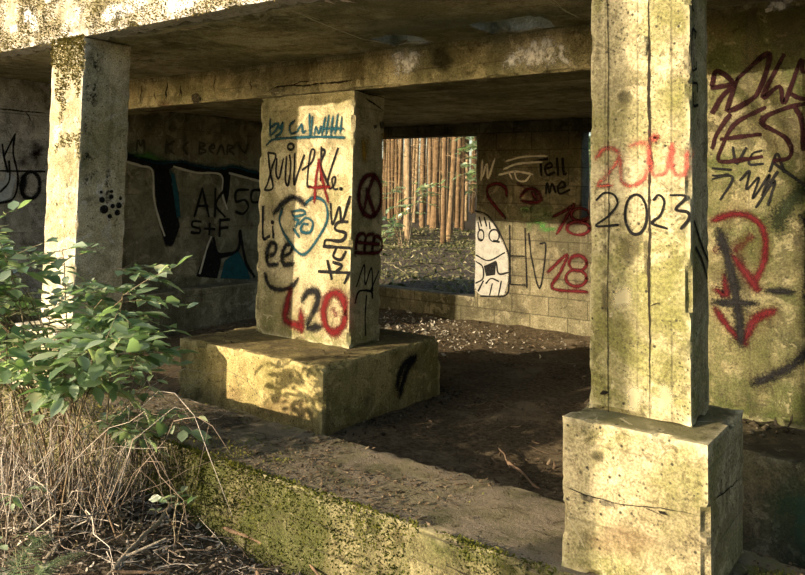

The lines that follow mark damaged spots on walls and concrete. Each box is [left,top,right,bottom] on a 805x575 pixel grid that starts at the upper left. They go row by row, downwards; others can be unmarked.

crack [250,79,387,111]
crack [647,0,658,419]
crack [565,486,701,517]